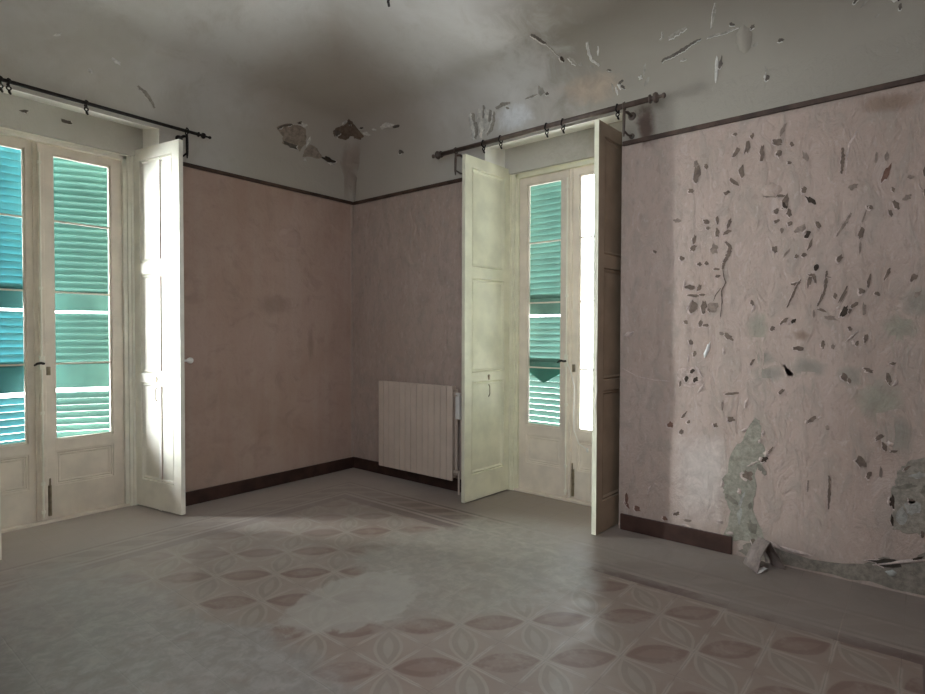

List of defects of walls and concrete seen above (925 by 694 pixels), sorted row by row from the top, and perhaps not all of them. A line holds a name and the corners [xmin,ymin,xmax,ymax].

spalling [277,121,337,166]
peeling [468,105,495,140]
peeling [687,160,708,194]
peeling [722,123,809,196]
peeling [874,152,925,217]
peeling [771,193,821,259]
peeling [806,264,819,289]
peeling [682,279,718,328]
peeling [813,274,880,346]
spalling [676,340,710,392]
peeling [712,392,748,428]
spalling [712,418,925,596]